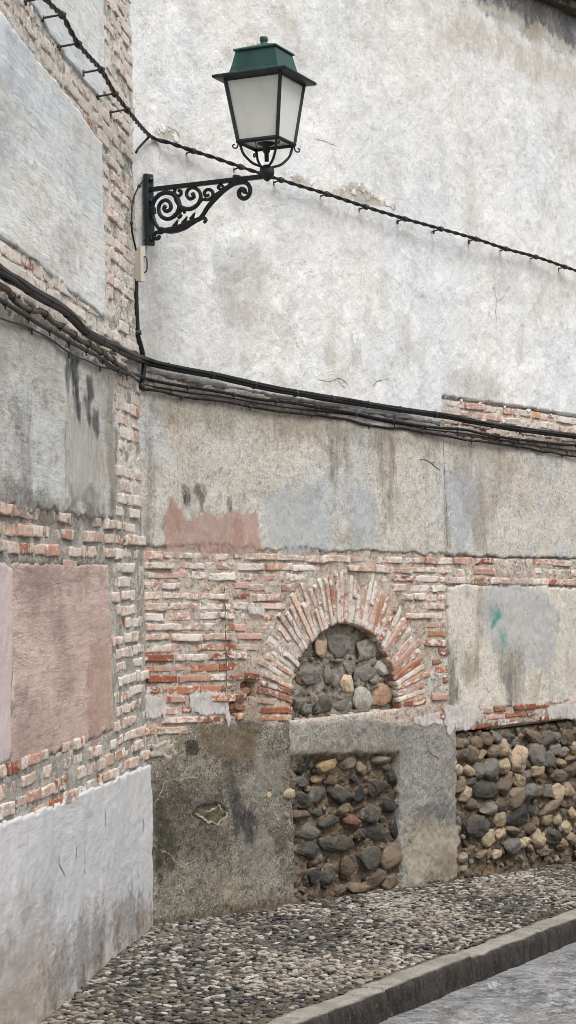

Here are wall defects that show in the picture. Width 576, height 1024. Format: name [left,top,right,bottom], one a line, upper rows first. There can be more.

water stain [65,357,105,517]
flaking render [192,804,228,825]
water stain [190,690,258,842]